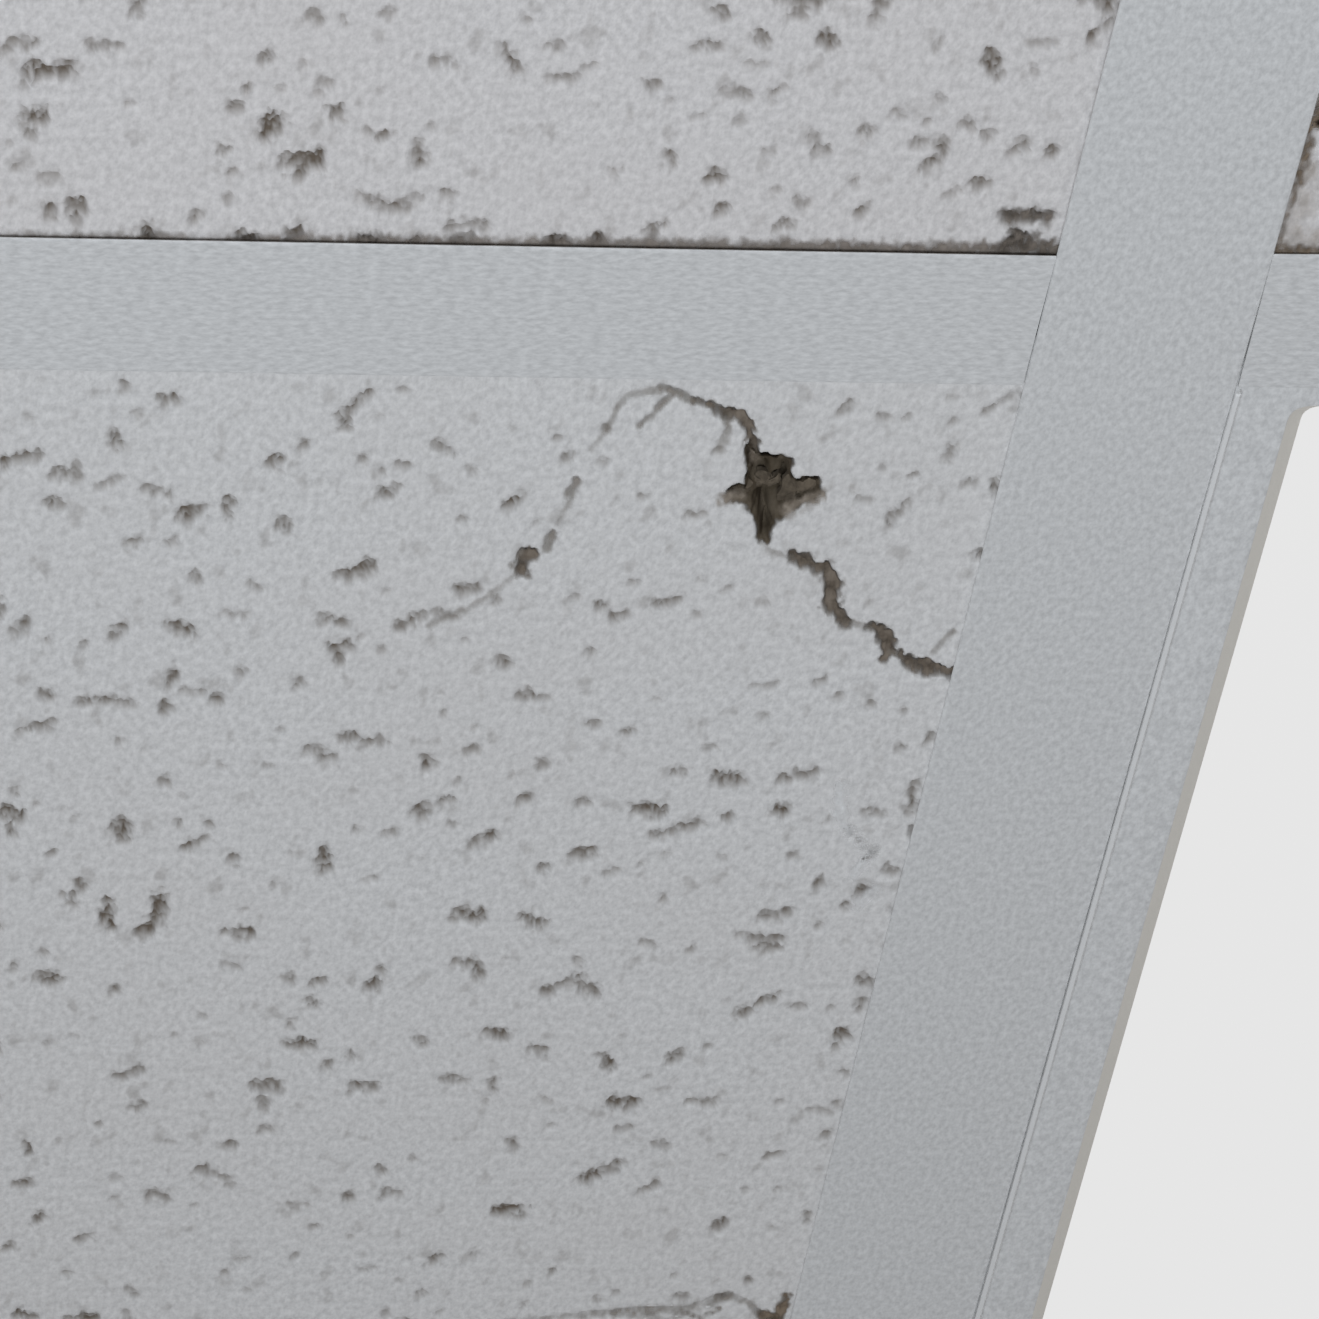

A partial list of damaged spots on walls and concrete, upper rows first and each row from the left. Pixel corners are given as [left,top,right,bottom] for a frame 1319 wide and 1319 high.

crack [640,387,761,462]
crack [515,531,555,578]
crack [788,550,954,677]
crack [610,1296,730,1317]